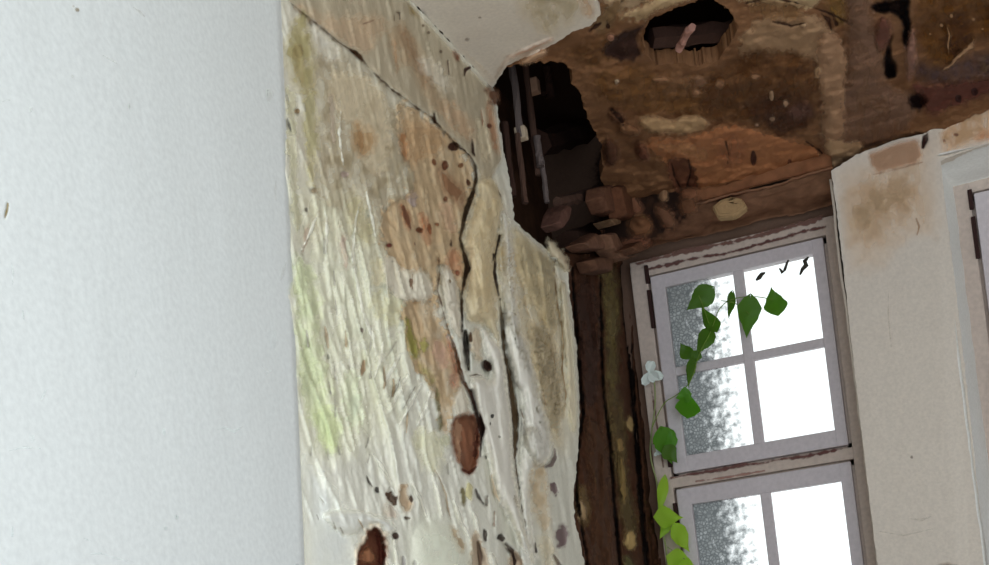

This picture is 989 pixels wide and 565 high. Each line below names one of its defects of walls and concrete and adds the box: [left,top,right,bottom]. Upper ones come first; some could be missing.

spalling [596,0,683,61]
spalling [872,0,916,79]
spalling [640,0,861,193]
peeling [871,141,921,171]
spalling [540,185,826,275]
peeling [291,0,575,565]
crack [302,12,664,565]
spalling [618,438,626,504]
peeling [670,449,837,482]
spalling [625,532,635,549]